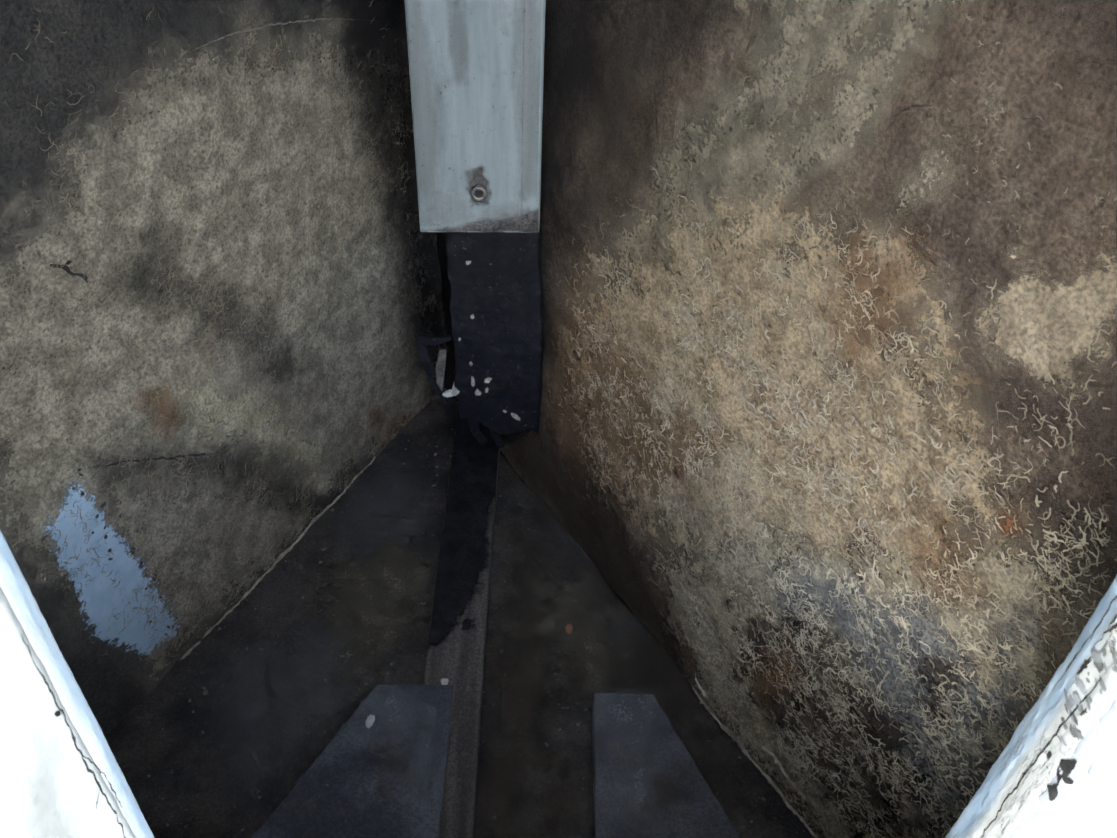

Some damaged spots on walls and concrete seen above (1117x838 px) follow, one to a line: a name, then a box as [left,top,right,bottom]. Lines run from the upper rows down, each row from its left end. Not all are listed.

damp [0,0,458,689]
damp [500,0,1081,838]
spalling [1061,623,1117,746]